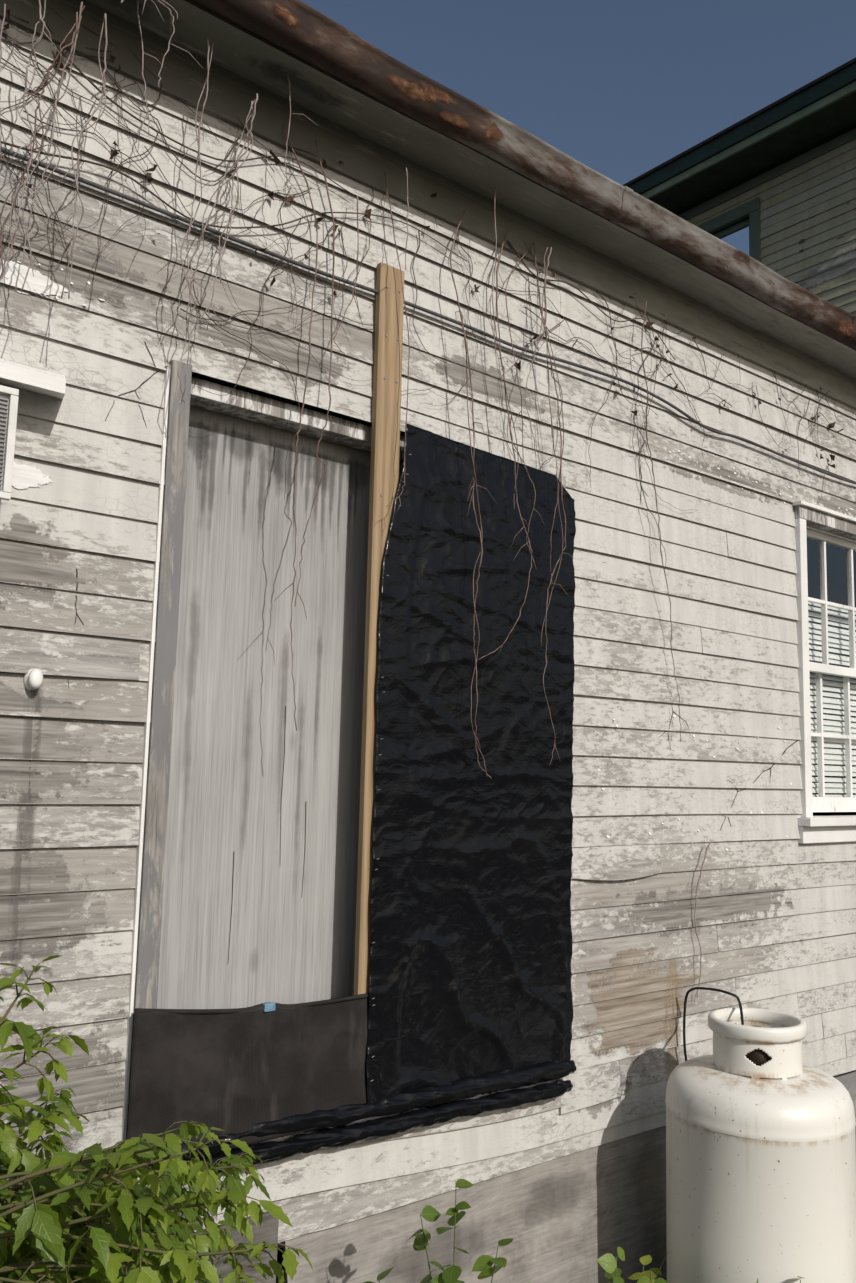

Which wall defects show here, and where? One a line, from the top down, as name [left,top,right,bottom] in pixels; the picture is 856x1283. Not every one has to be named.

rust [275,4,298,26]
rust [388,75,470,130]
peeling [0,206,173,308]
peeling [198,306,350,387]
peeling [12,461,53,489]
peeling [0,514,96,610]
peeling [0,682,117,812]
peeling [0,846,108,989]